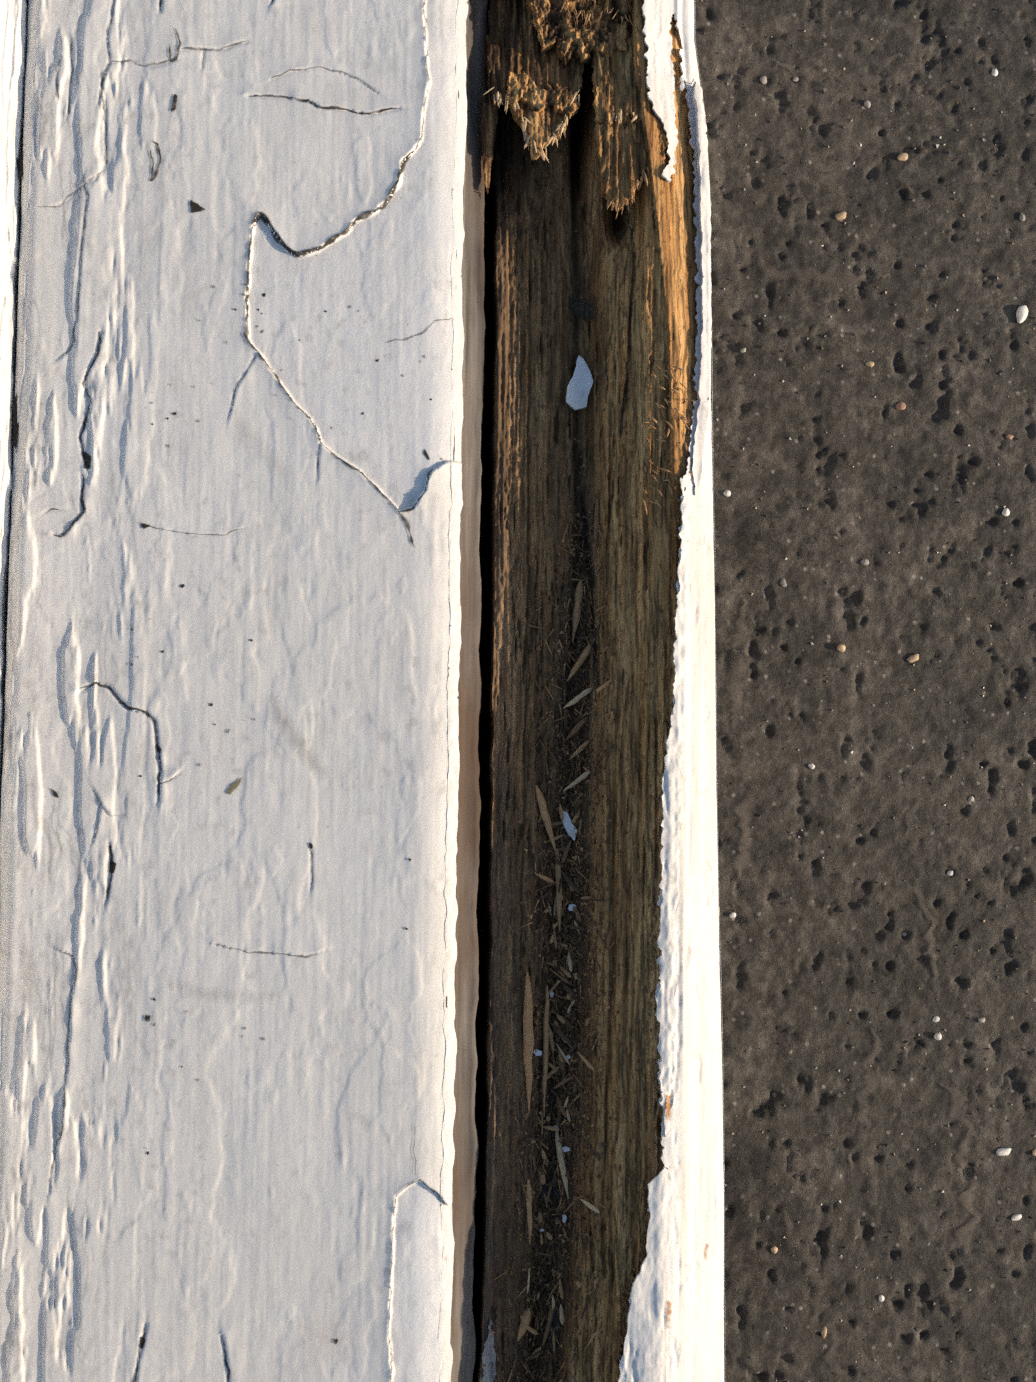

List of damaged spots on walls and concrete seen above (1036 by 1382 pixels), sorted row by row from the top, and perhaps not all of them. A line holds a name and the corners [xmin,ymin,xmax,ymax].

crack [250,67,399,115]
crack [43,0,245,537]
crack [82,682,177,795]
peeling [388,1140,456,1382]
peeling [618,1166,675,1382]